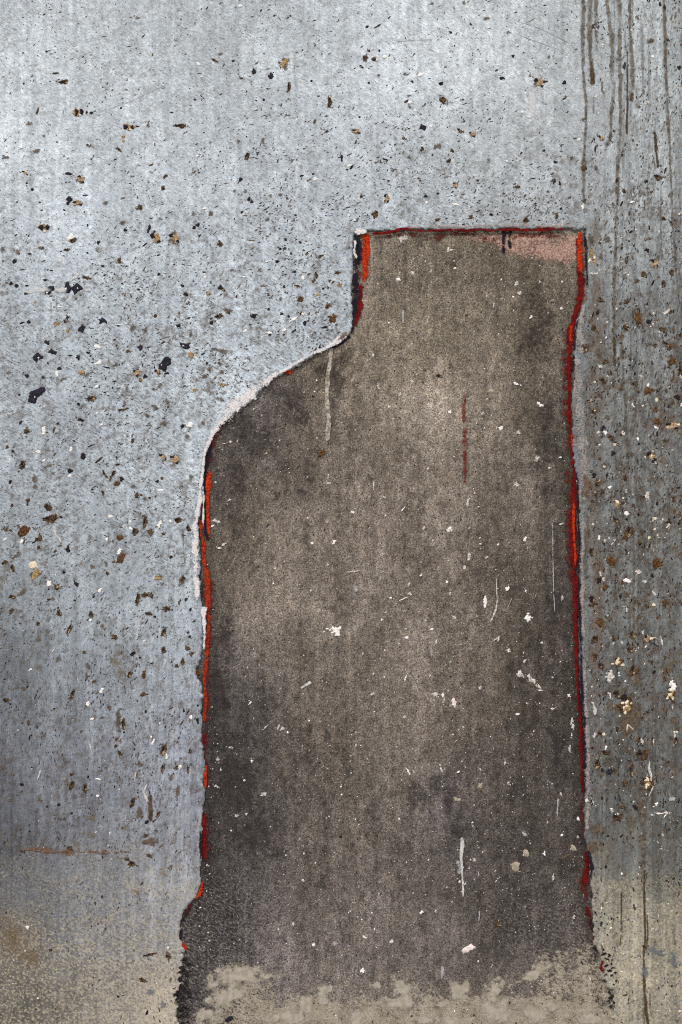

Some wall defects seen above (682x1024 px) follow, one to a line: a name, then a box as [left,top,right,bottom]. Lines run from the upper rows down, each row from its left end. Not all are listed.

water stain [580,0,635,492]
water stain [654,0,677,271]
peeling [132,194,682,1024]